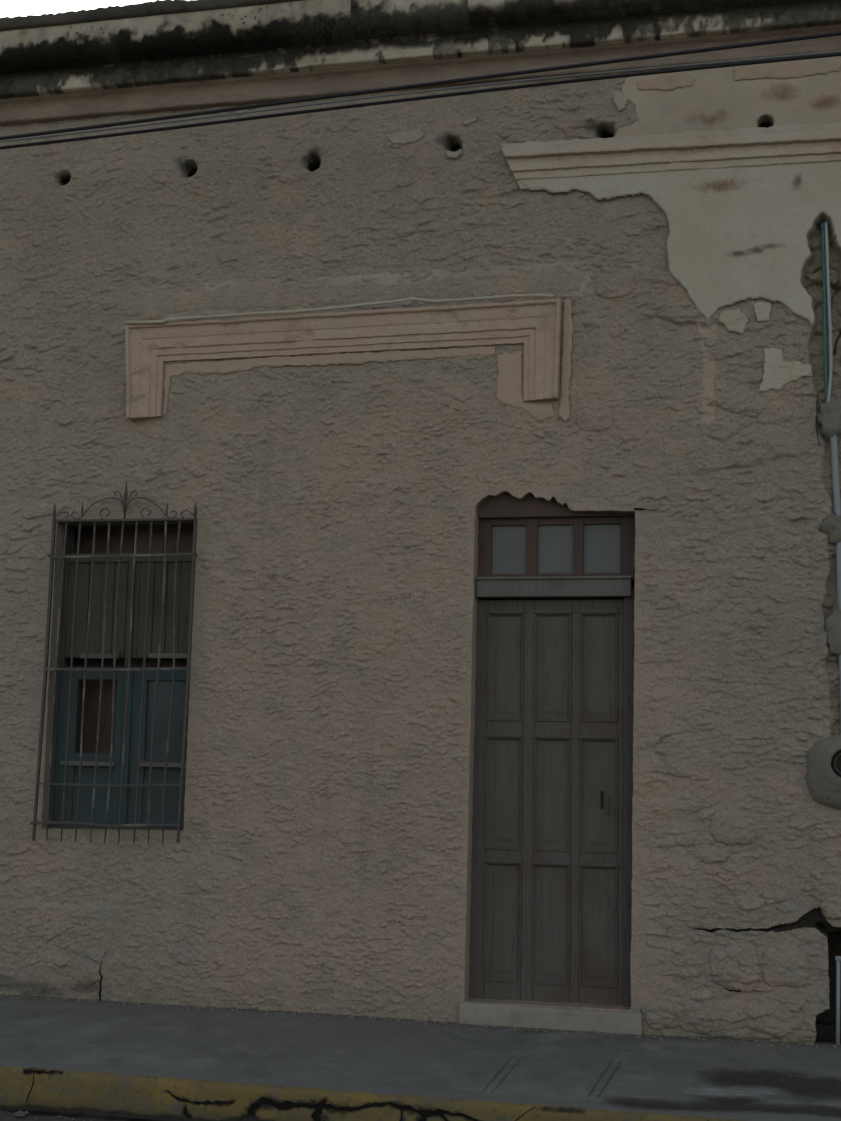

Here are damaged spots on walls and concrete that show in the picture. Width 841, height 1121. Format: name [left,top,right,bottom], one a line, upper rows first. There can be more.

mould [0,0,841,99]
flaking render [502,56,841,147]
flaking render [509,161,841,515]
spalling [467,479,581,512]
spalling [822,537,840,737]
crack [693,925,783,933]
crack [87,949,108,1000]
crack [23,1068,64,1102]
crack [166,1090,479,1121]
crack [515,1107,583,1121]